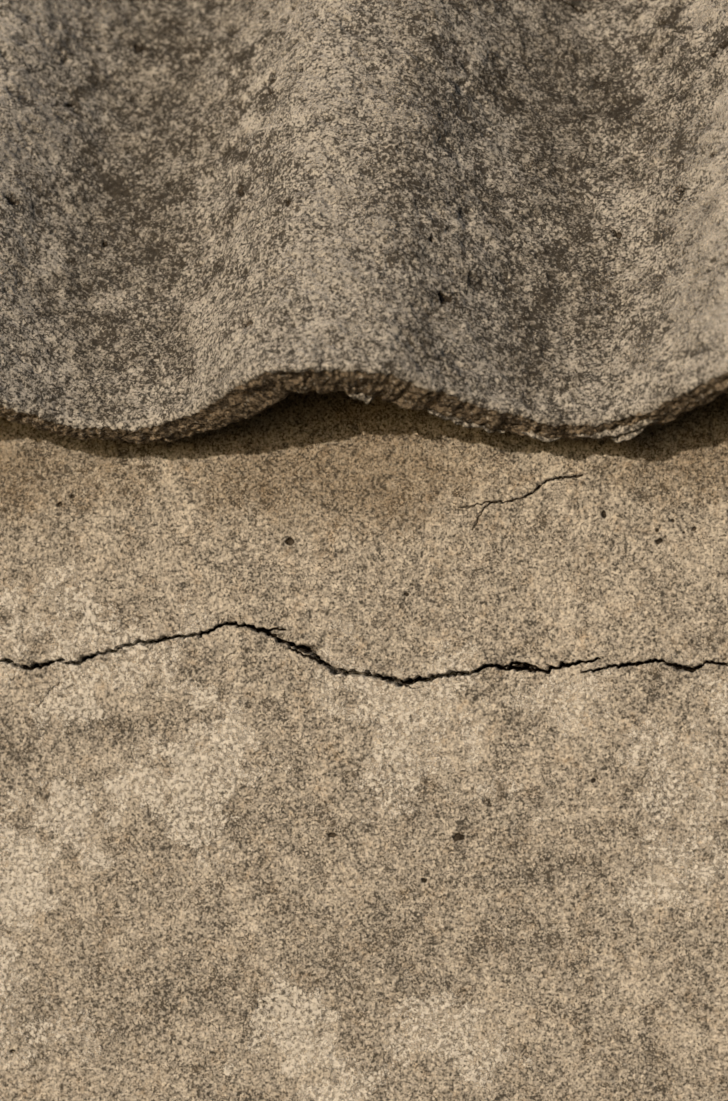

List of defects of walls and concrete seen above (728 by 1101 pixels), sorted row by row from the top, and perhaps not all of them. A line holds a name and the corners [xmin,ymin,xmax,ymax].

crack [459,474,583,530]
crack [0,621,728,712]